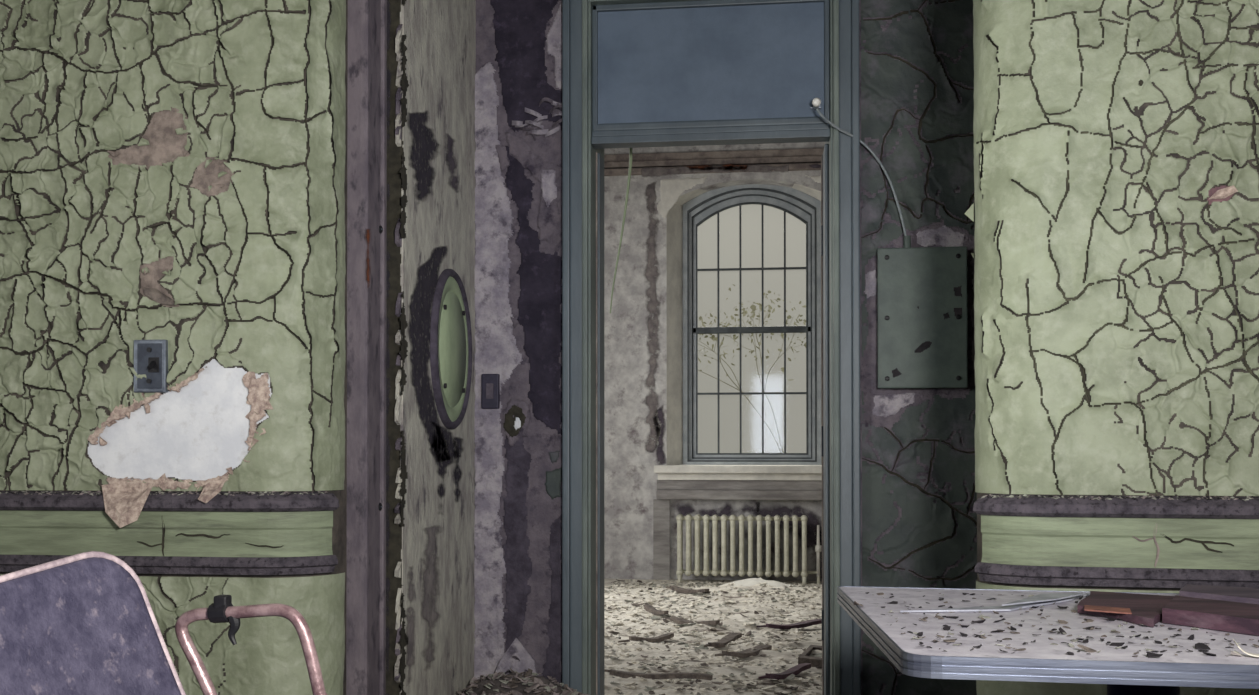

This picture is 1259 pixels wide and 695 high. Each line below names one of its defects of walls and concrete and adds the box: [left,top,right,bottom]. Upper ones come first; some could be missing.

crack [0,0,336,491]
peeling [0,0,346,528]
flaking render [386,0,409,695]
flaking render [474,0,562,683]
flaking render [657,176,707,218]
crack [860,0,1259,584]
peeling [861,0,1259,593]
crack [862,650,901,695]
peeling [862,633,1107,695]
peeling [1180,686,1259,695]